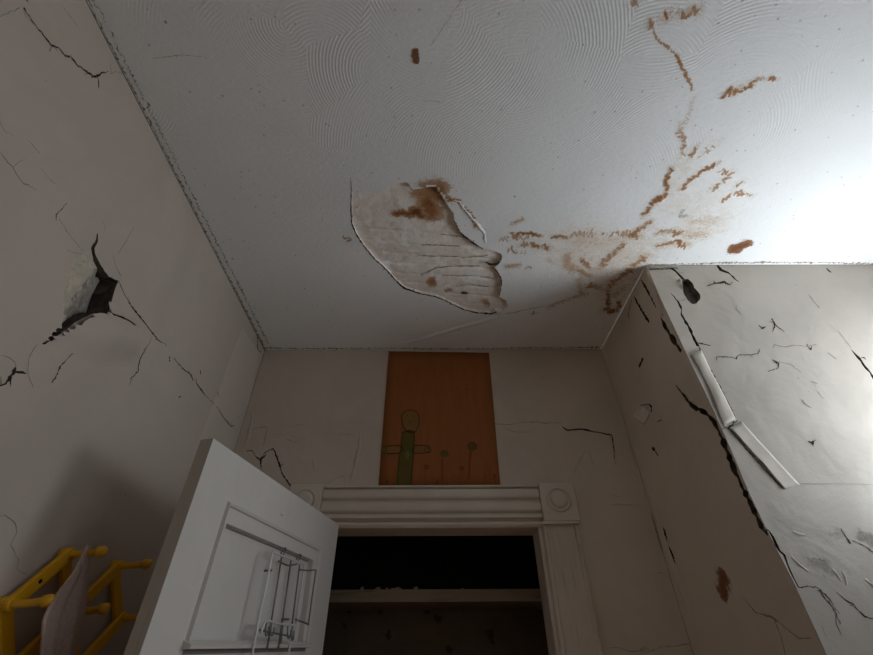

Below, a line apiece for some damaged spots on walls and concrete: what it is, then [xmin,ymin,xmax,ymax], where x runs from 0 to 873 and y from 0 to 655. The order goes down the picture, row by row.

crack [0,0,599,353]
spalling [35,233,167,367]
spalling [350,178,558,315]
spalling [672,268,700,304]
corrosion [727,240,754,254]
crack [648,261,873,286]
crack [0,338,73,390]
crack [169,356,238,432]
peeling [691,350,800,489]
crack [247,448,291,486]
crack [661,296,873,655]
corrosion [716,567,731,601]